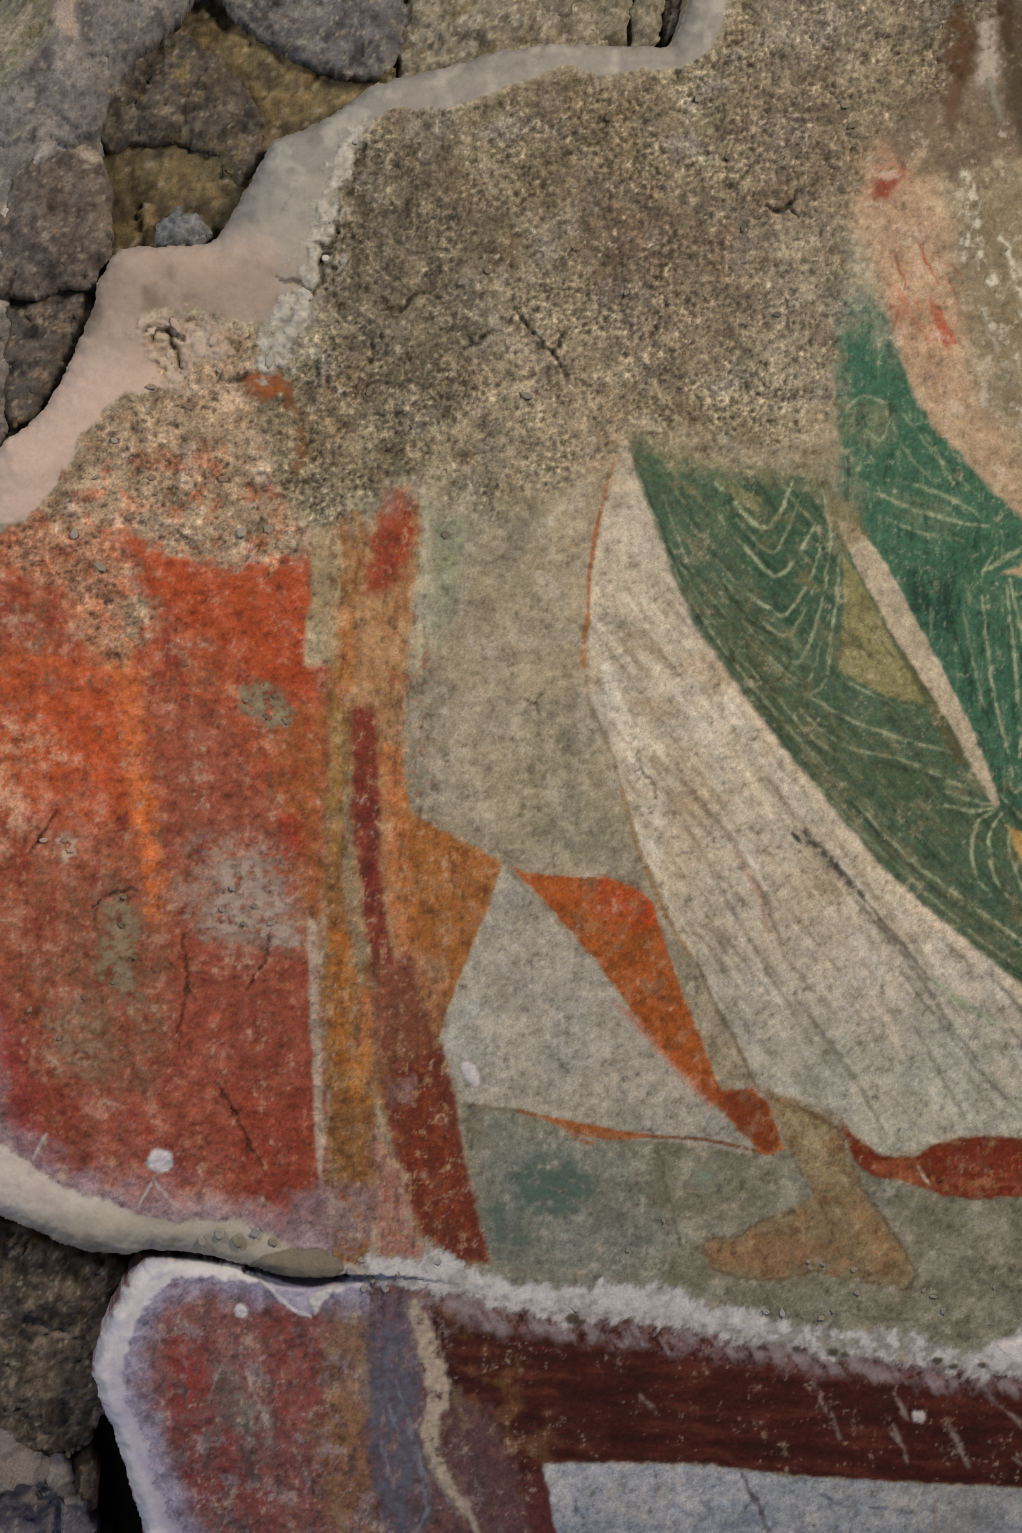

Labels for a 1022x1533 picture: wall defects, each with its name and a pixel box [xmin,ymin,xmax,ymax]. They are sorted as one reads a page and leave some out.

flaking render [0,0,1009,659]
crack [138,1227,400,1293]